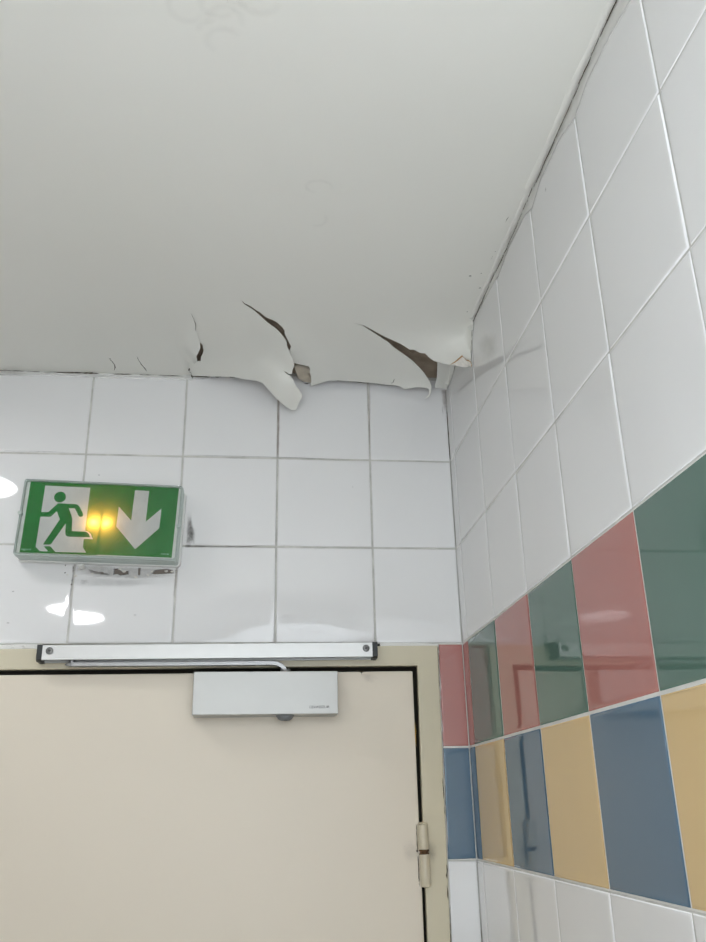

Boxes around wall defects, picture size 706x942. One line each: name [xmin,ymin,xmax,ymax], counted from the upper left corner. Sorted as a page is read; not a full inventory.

crack [471,0,617,343]
crack [0,357,207,379]
peeling [189,299,474,410]